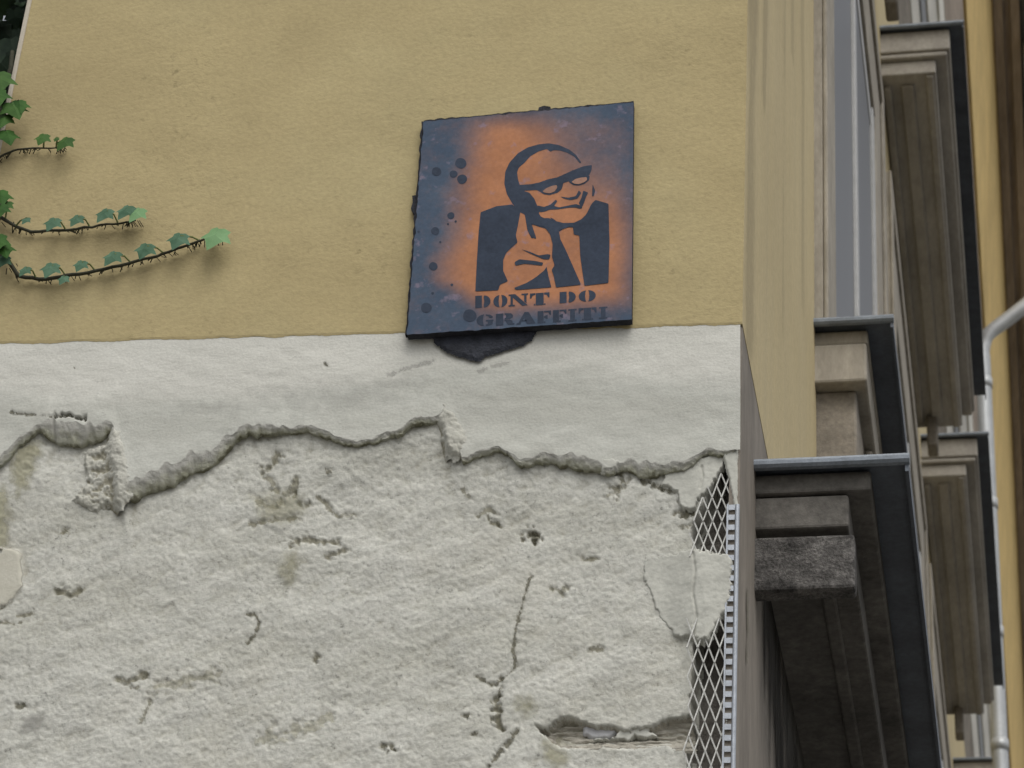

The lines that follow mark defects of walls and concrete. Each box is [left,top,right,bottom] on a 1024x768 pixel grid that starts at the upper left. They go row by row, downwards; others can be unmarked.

flaking render [0,403,738,768]
crack [476,576,532,701]
crack [489,730,519,768]